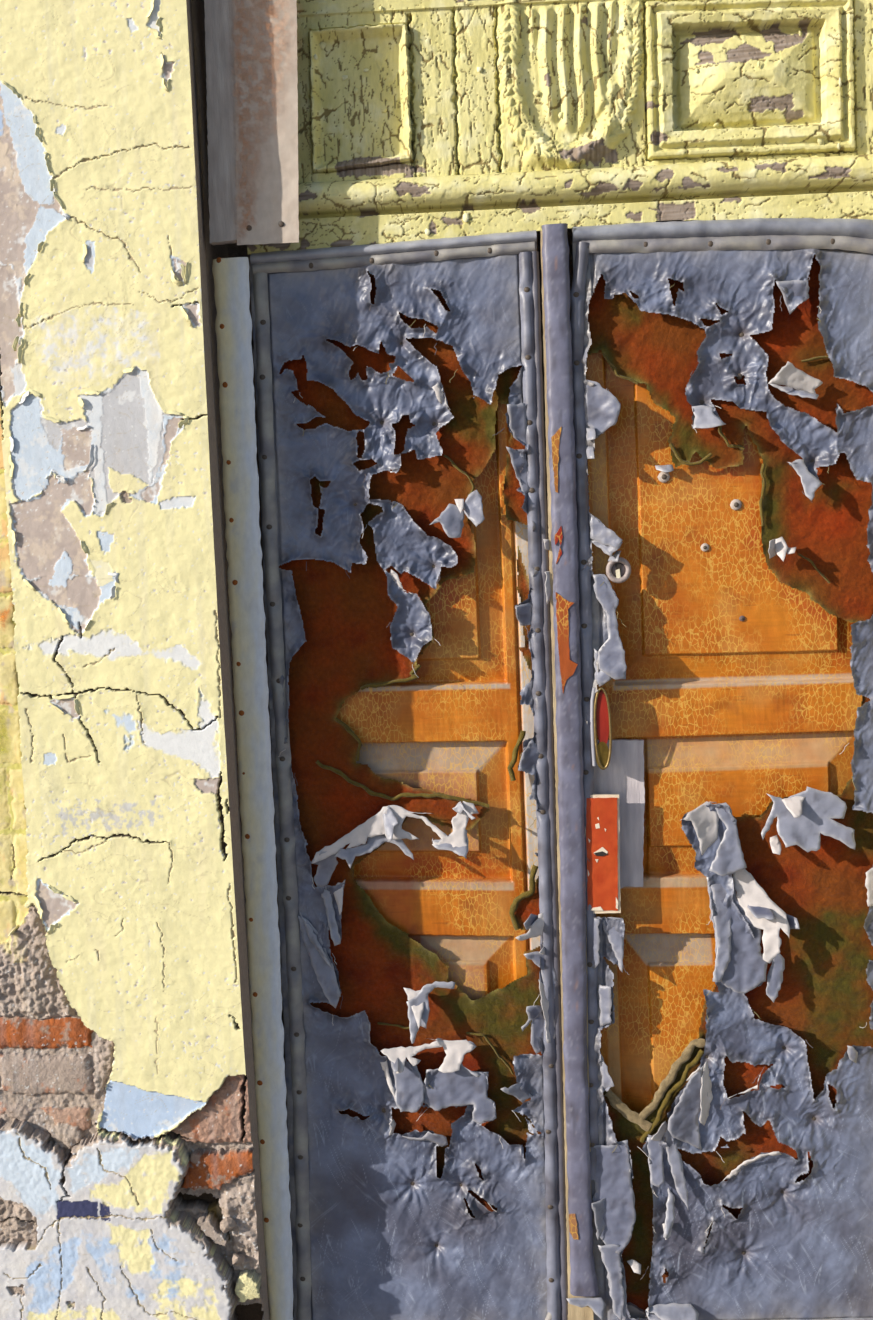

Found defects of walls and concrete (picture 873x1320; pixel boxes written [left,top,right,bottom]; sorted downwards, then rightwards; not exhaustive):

peeling [127,0,176,92]
crack [26,96,108,109]
crack [24,142,202,328]
crack [0,354,8,440]
peeling [0,79,201,670]
crack [22,610,222,762]
peeling [44,752,58,765]
peeling [105,690,222,794]
crack [0,833,174,894]
crack [218,771,238,982]
flaking render [0,878,264,1320]